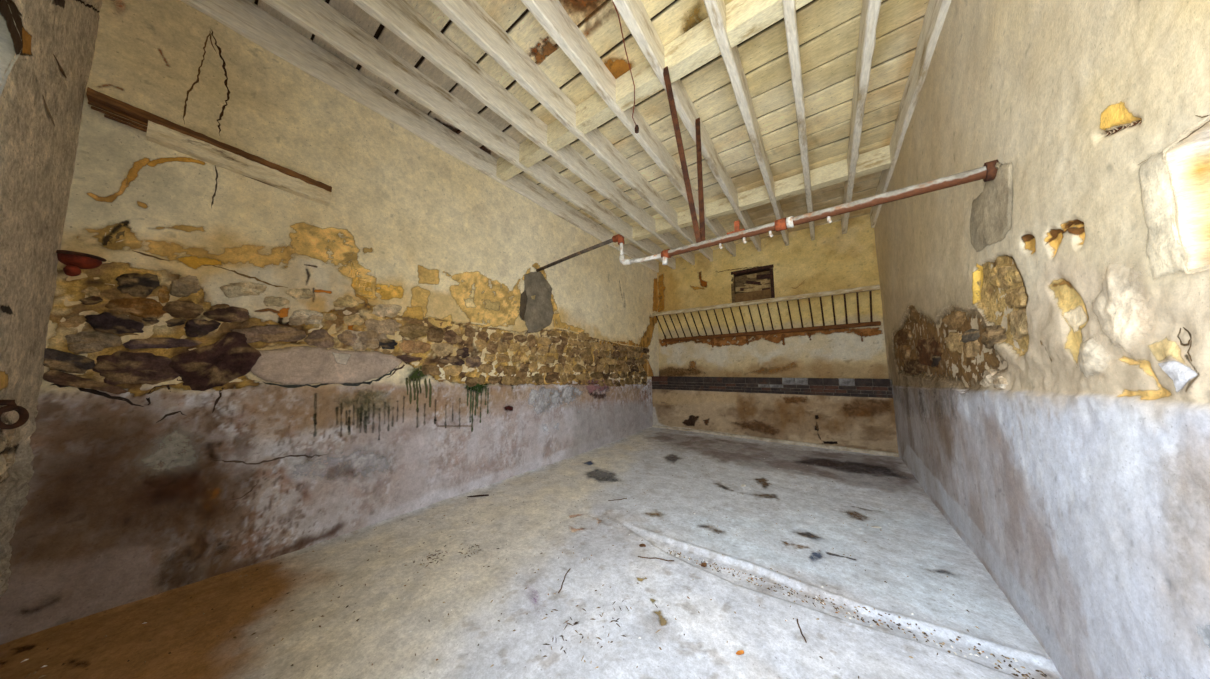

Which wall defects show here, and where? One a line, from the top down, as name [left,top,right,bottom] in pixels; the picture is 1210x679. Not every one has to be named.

crack [76,0,100,13]
corrosion [529,37,558,64]
crack [183,28,230,135]
spalling [1100,102,1142,137]
peeling [87,157,205,203]
crack [210,166,218,207]
spalling [1021,219,1085,257]
spalling [43,220,1052,397]
flaking render [1049,279,1089,363]
crack [262,360,439,388]
flaking render [1118,338,1199,400]
damp [142,429,199,503]